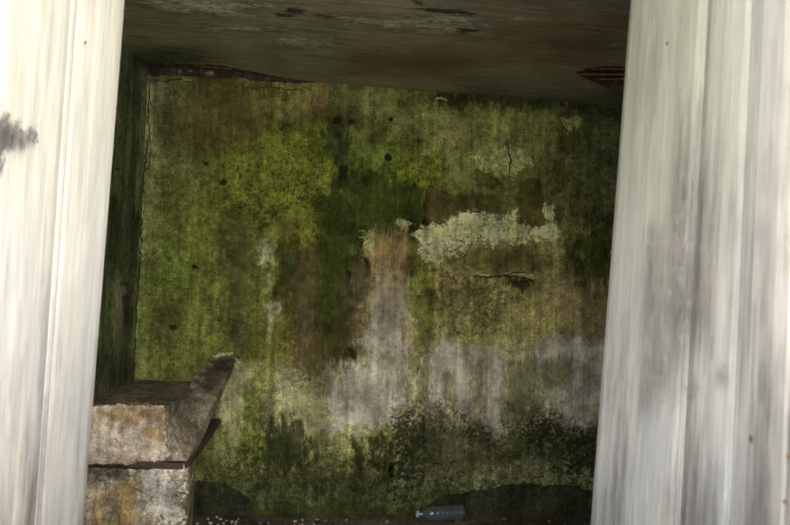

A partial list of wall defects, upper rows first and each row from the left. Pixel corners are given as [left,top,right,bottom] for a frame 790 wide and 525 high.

leakage [431,91,622,121]
leakage [233,111,501,353]
leakage [446,243,554,293]
leakage [515,131,614,294]
leakage [193,389,599,516]